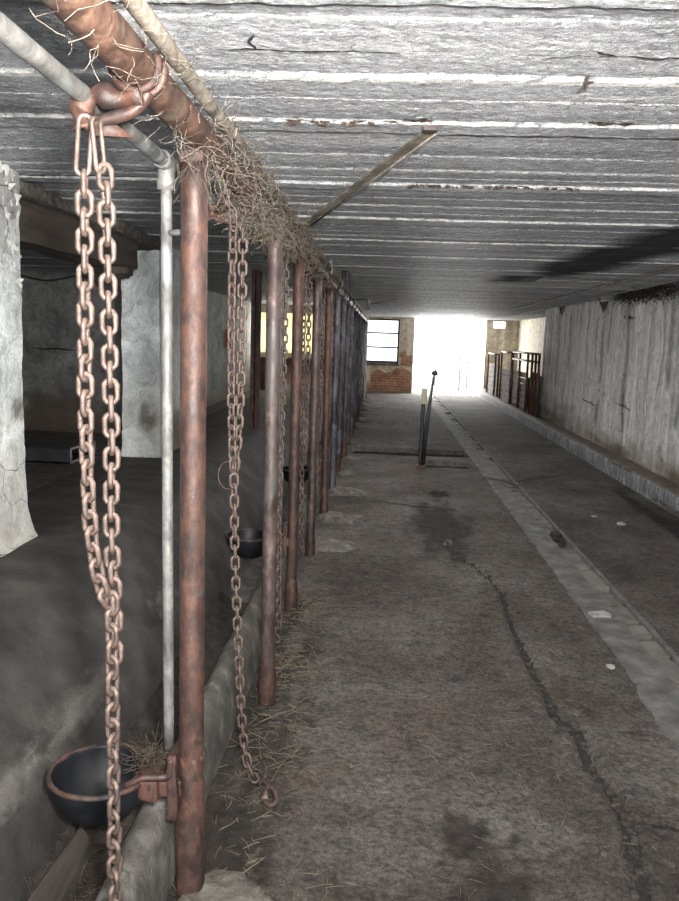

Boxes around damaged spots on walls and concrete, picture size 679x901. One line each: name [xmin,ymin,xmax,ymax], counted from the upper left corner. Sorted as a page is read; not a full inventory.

crack [541,51,679,60]
peeling [0,160,24,293]
flaking render [369,351,413,392]
crack [441,540,679,901]